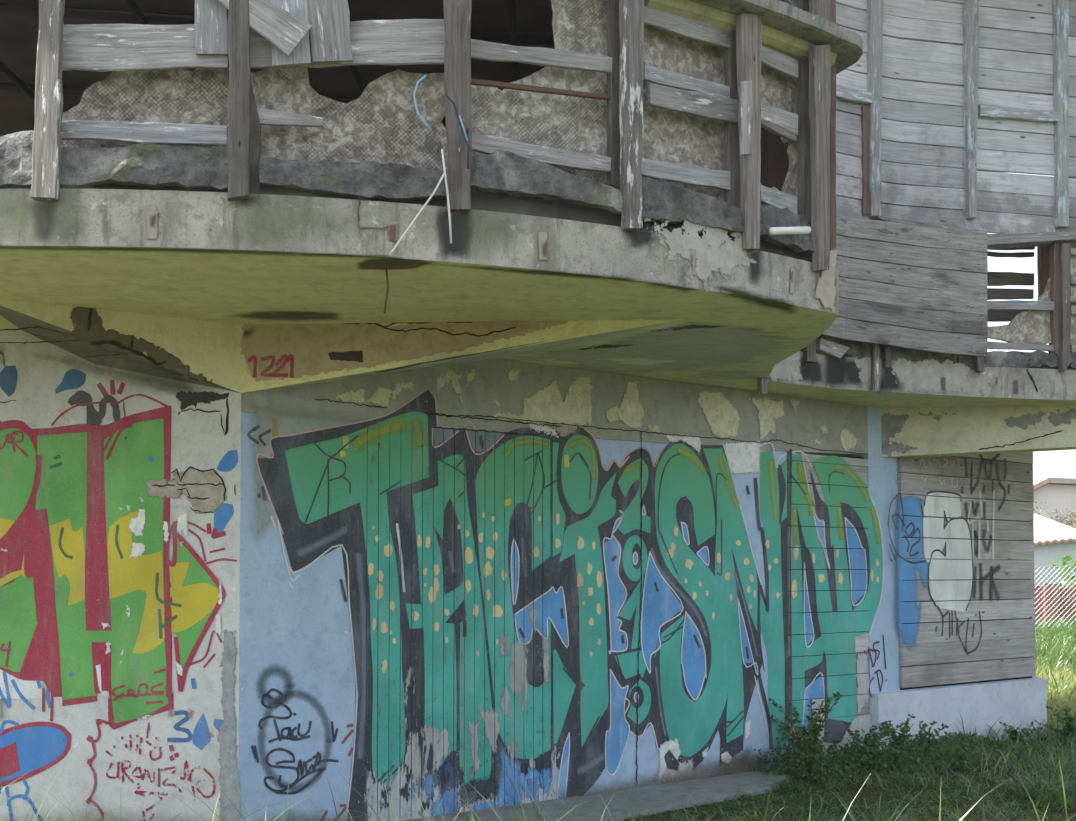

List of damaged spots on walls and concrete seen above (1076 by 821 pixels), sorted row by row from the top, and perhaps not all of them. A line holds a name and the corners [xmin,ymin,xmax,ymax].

spalling [814,249,839,314]
spalling [61,307,229,435]
peeling [606,378,701,454]
peeling [697,391,800,475]
peeling [881,411,957,457]
crack [979,430,1062,450]
peeling [1004,409,1076,430]
flaking render [119,466,236,557]